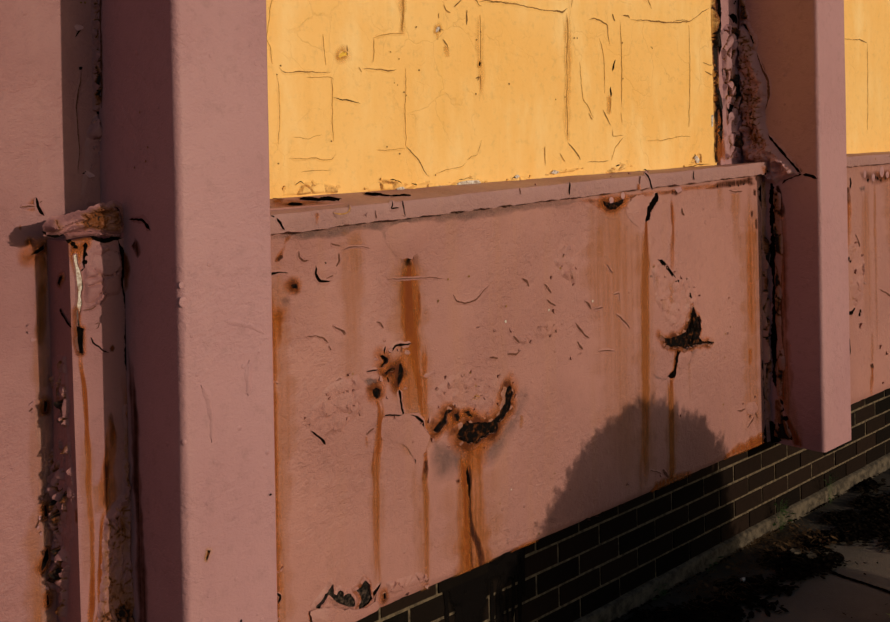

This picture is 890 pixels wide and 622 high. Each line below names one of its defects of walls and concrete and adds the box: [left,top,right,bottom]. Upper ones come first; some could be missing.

peeling [35,354,77,622]
rust [79,363,116,622]
rust [272,308,283,622]
crack [271,196,342,230]
peeling [311,575,381,611]
crack [363,192,412,218]
rust [366,258,516,574]
crack [438,0,723,164]
crack [638,171,659,222]
rust [641,222,714,492]
peeling [643,258,714,352]
peeling [720,0,802,446]